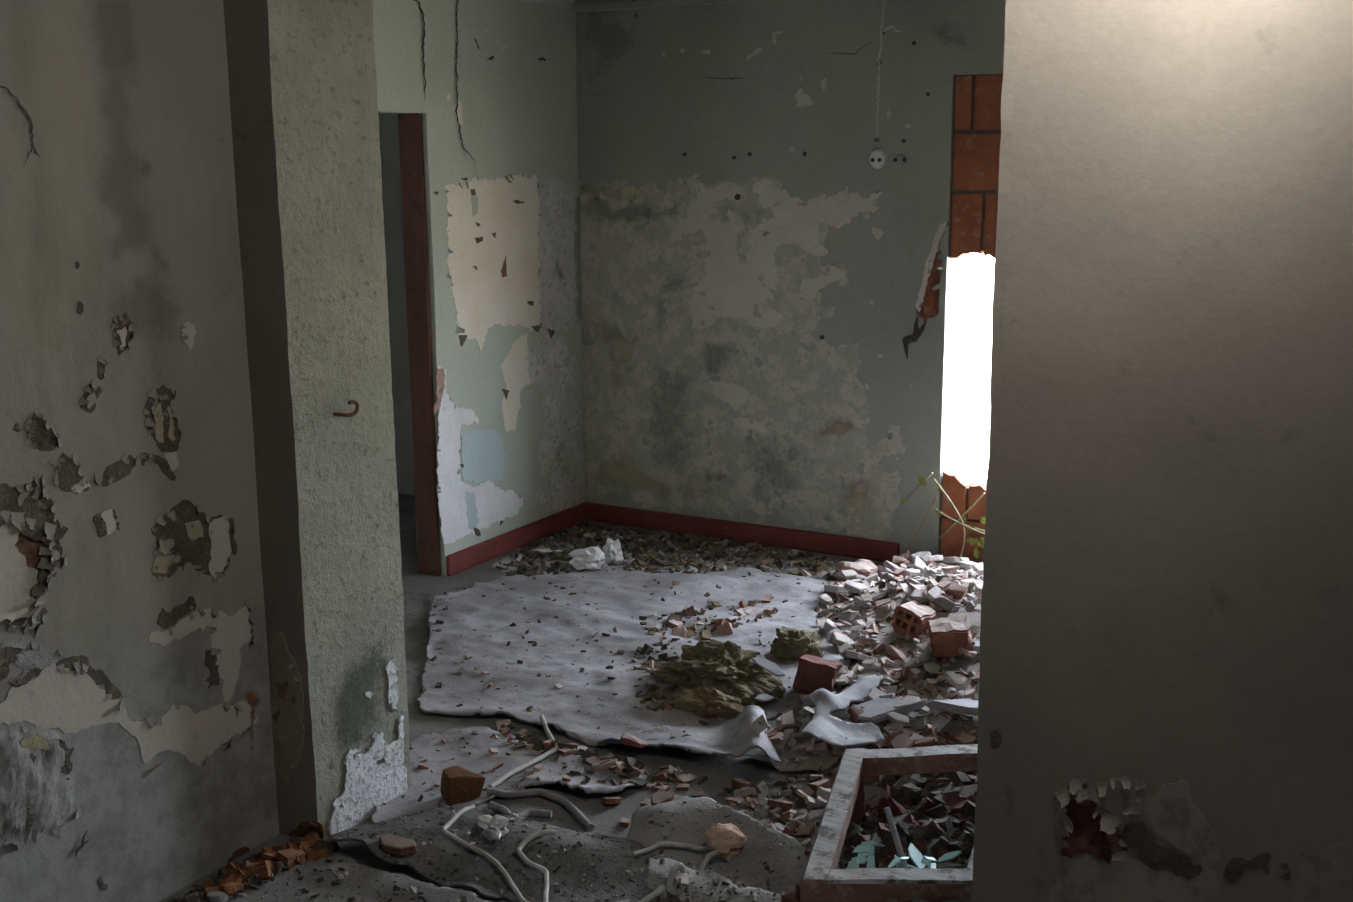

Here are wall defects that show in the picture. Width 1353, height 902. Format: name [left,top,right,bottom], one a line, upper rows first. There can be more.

crack [0,86,40,167]
peeling [79,312,136,413]
peeling [433,172,906,544]
spalling [902,222,949,359]
peeling [0,385,305,785]